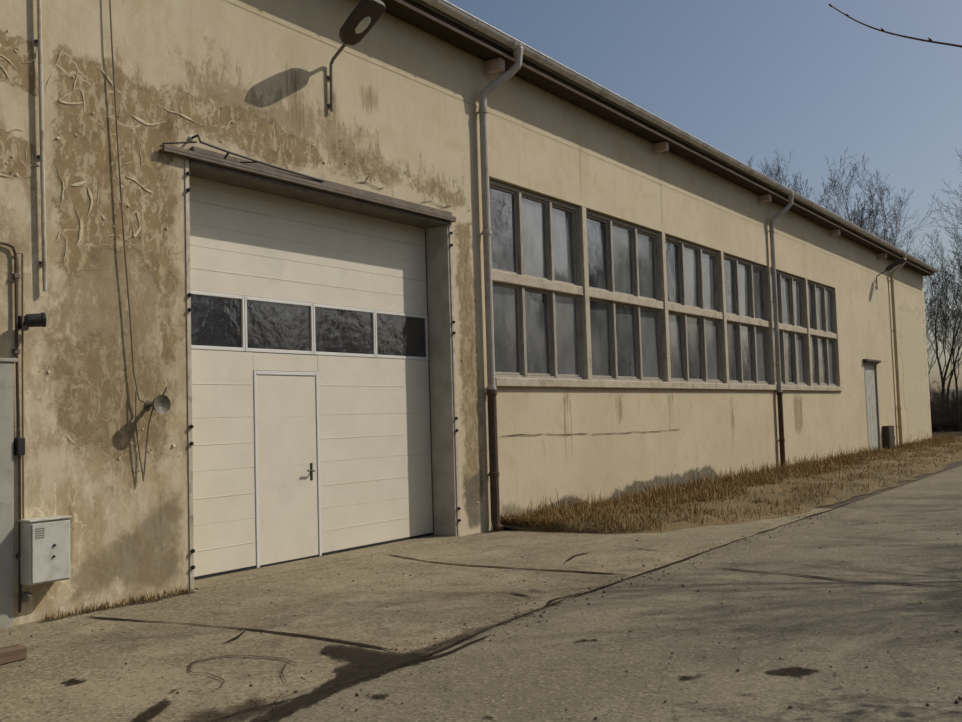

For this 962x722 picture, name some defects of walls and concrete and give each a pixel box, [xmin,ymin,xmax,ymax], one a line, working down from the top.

flaking render [0,28,484,503]
damp [465,474,481,527]
crack [86,616,398,651]